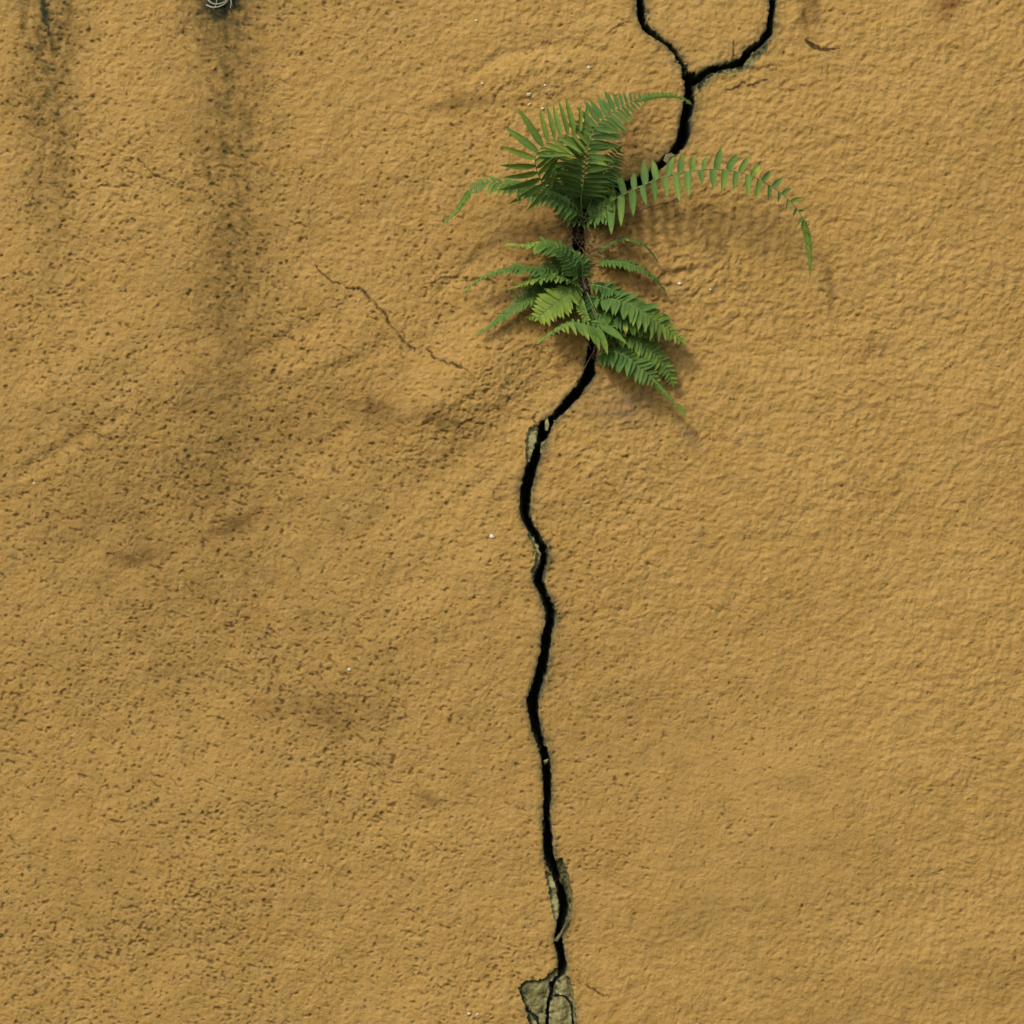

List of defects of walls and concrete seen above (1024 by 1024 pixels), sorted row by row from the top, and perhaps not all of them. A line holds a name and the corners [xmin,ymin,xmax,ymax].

crack [572,0,777,293]
crack [519,335,604,1024]
spalling [517,967,577,1024]